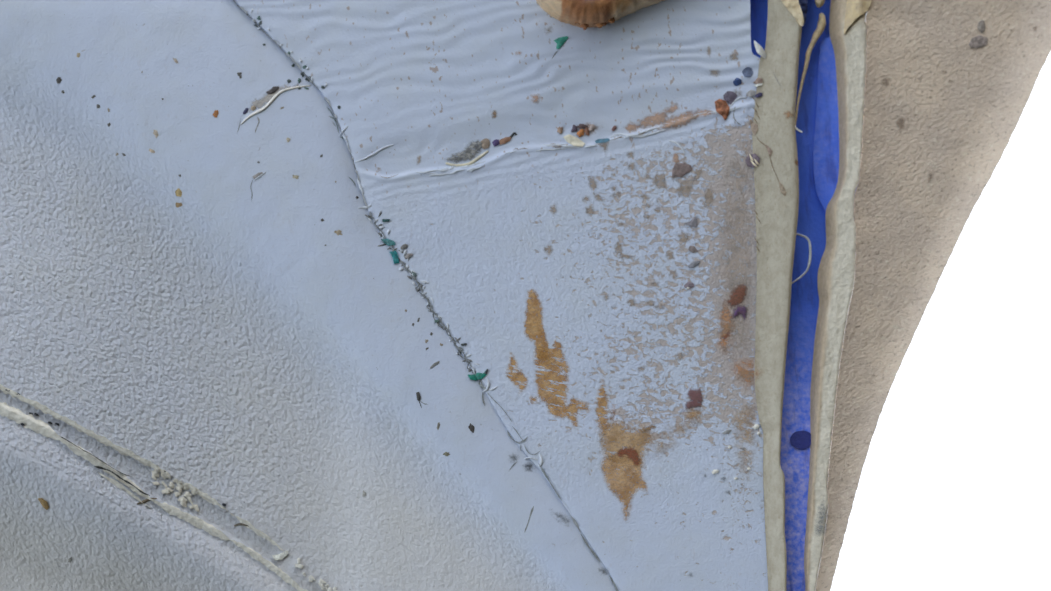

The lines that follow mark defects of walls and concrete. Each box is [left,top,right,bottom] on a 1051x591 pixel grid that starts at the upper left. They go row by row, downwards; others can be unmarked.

peeling [237,85,310,133]
peeling [416,138,490,176]
peeling [504,123,675,155]
peeling [468,368,498,392]
corrosion [507,290,663,516]
peeling [0,384,337,591]